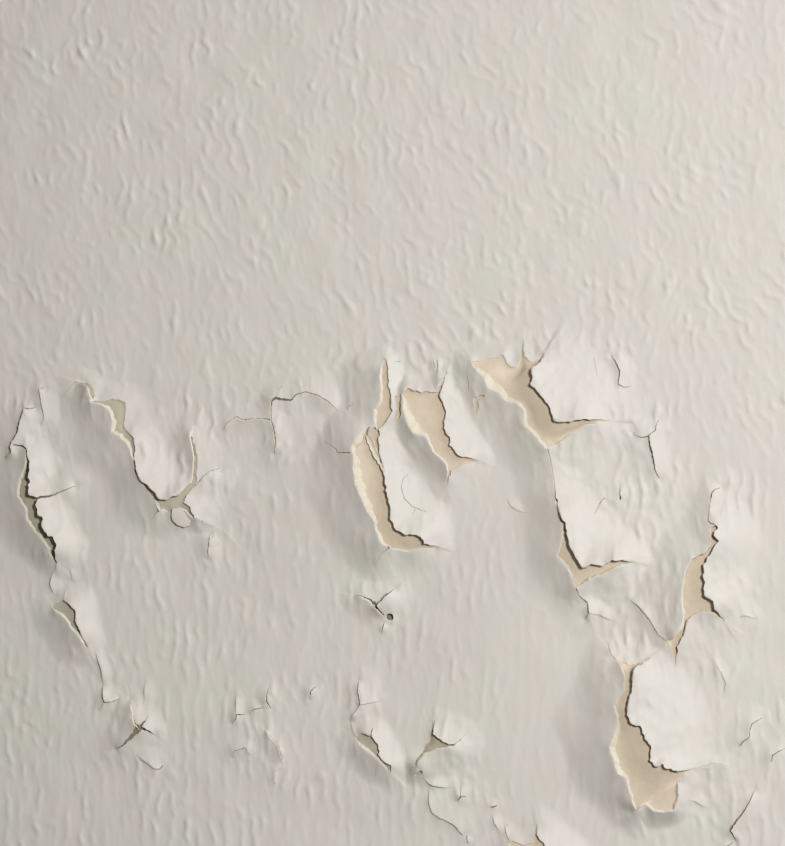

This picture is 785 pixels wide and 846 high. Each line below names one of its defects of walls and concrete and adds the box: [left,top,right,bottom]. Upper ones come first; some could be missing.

crack [217,379,342,459]
peeling [1,374,248,716]
crack [348,584,400,638]
peeling [319,320,761,846]
crack [734,712,785,767]
crack [719,785,761,846]